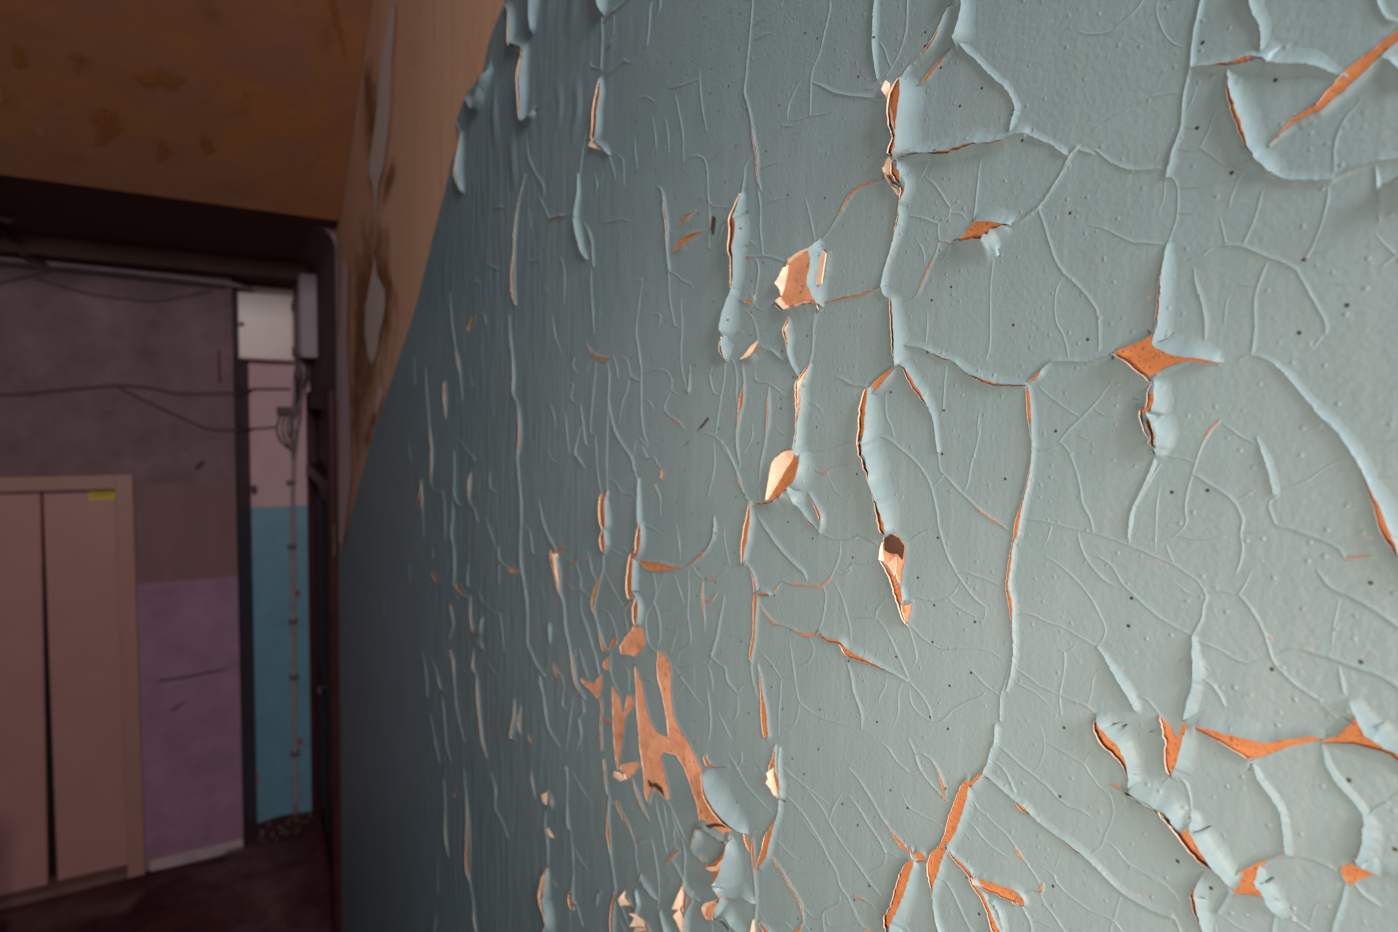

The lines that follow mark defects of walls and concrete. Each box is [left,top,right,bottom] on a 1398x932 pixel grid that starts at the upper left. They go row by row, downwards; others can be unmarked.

peeling [369,4,395,214]
peeling [454,48,494,195]
peeling [504,0,546,186]
peeling [365,255,385,364]
peeling [762,73,1225,539]
peeling [753,432,917,630]
crack [353,0,1398,932]
peeling [579,618,756,932]
peeling [942,843,1125,932]
peeling [1034,695,1398,932]